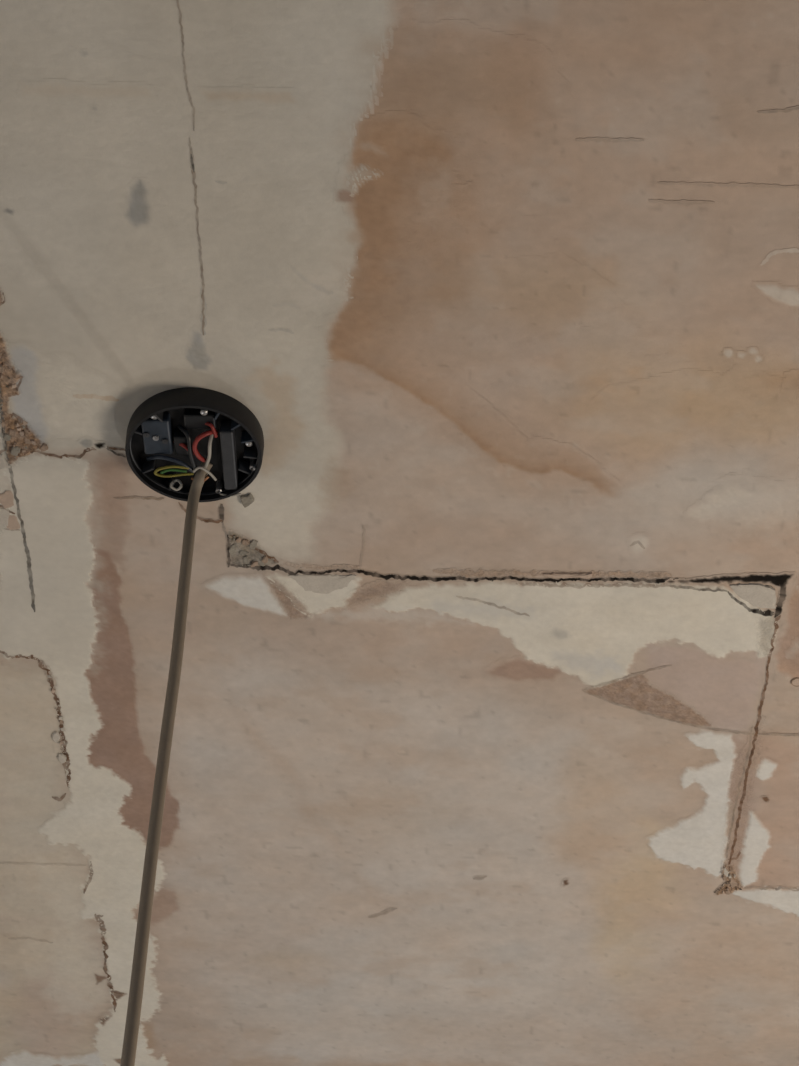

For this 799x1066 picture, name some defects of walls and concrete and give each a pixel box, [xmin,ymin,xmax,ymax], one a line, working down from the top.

crack [176,0,208,335]
leakage [313,19,630,501]
crack [0,650,71,802]
crack [0,861,124,1012]
crack [0,384,126,612]
leakage [88,453,183,852]
leakage [150,883,184,928]
peeling [0,0,414,1066]
crack [113,493,797,868]
flaking render [201,572,799,918]